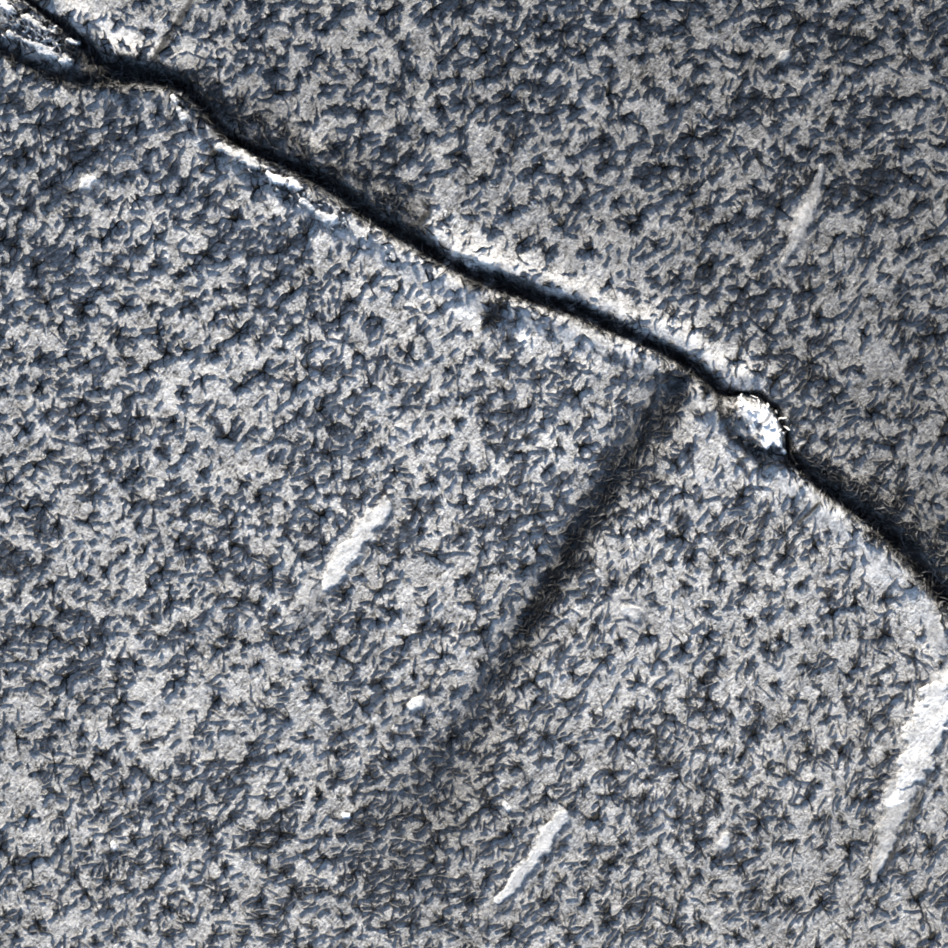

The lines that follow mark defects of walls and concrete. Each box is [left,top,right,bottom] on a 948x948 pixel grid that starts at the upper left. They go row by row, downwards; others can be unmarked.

crack [0,0,948,681]